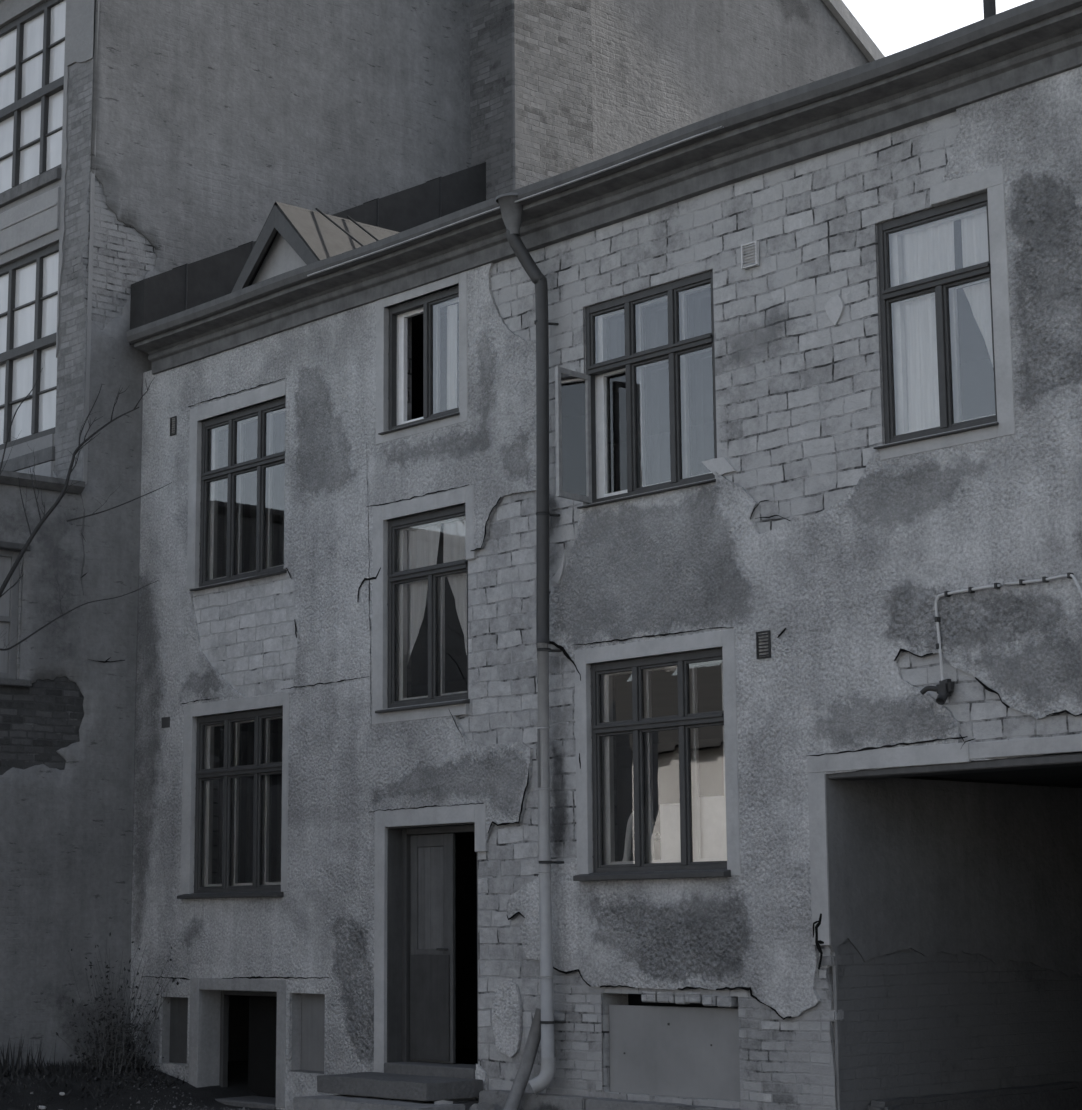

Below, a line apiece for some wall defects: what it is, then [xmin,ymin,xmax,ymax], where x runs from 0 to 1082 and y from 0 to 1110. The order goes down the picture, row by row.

spalling [54,59,157,481]
spalling [0,676,84,775]
spalling [185,568,297,697]
spalling [458,111,961,1110]
flaking render [887,585,1082,743]